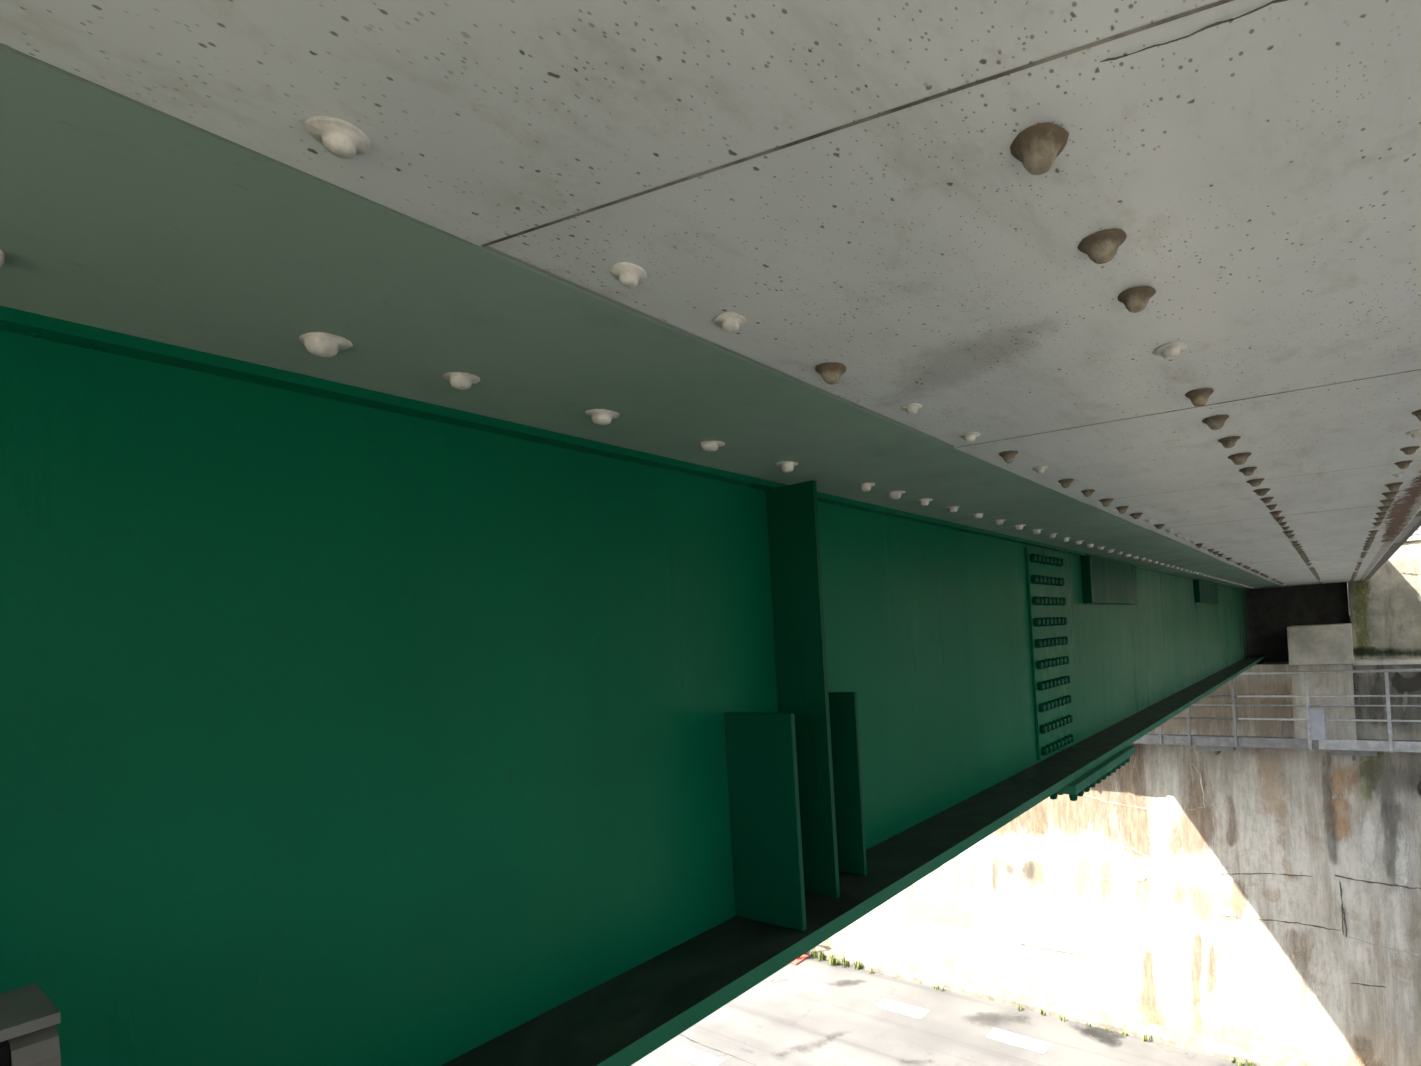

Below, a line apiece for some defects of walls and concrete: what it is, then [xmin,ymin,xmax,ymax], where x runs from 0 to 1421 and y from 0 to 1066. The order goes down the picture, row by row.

rust [1381,471,1421,544]
damp [930,856,961,899]
damp [1023,861,1043,887]
crack [1218,873,1421,956]